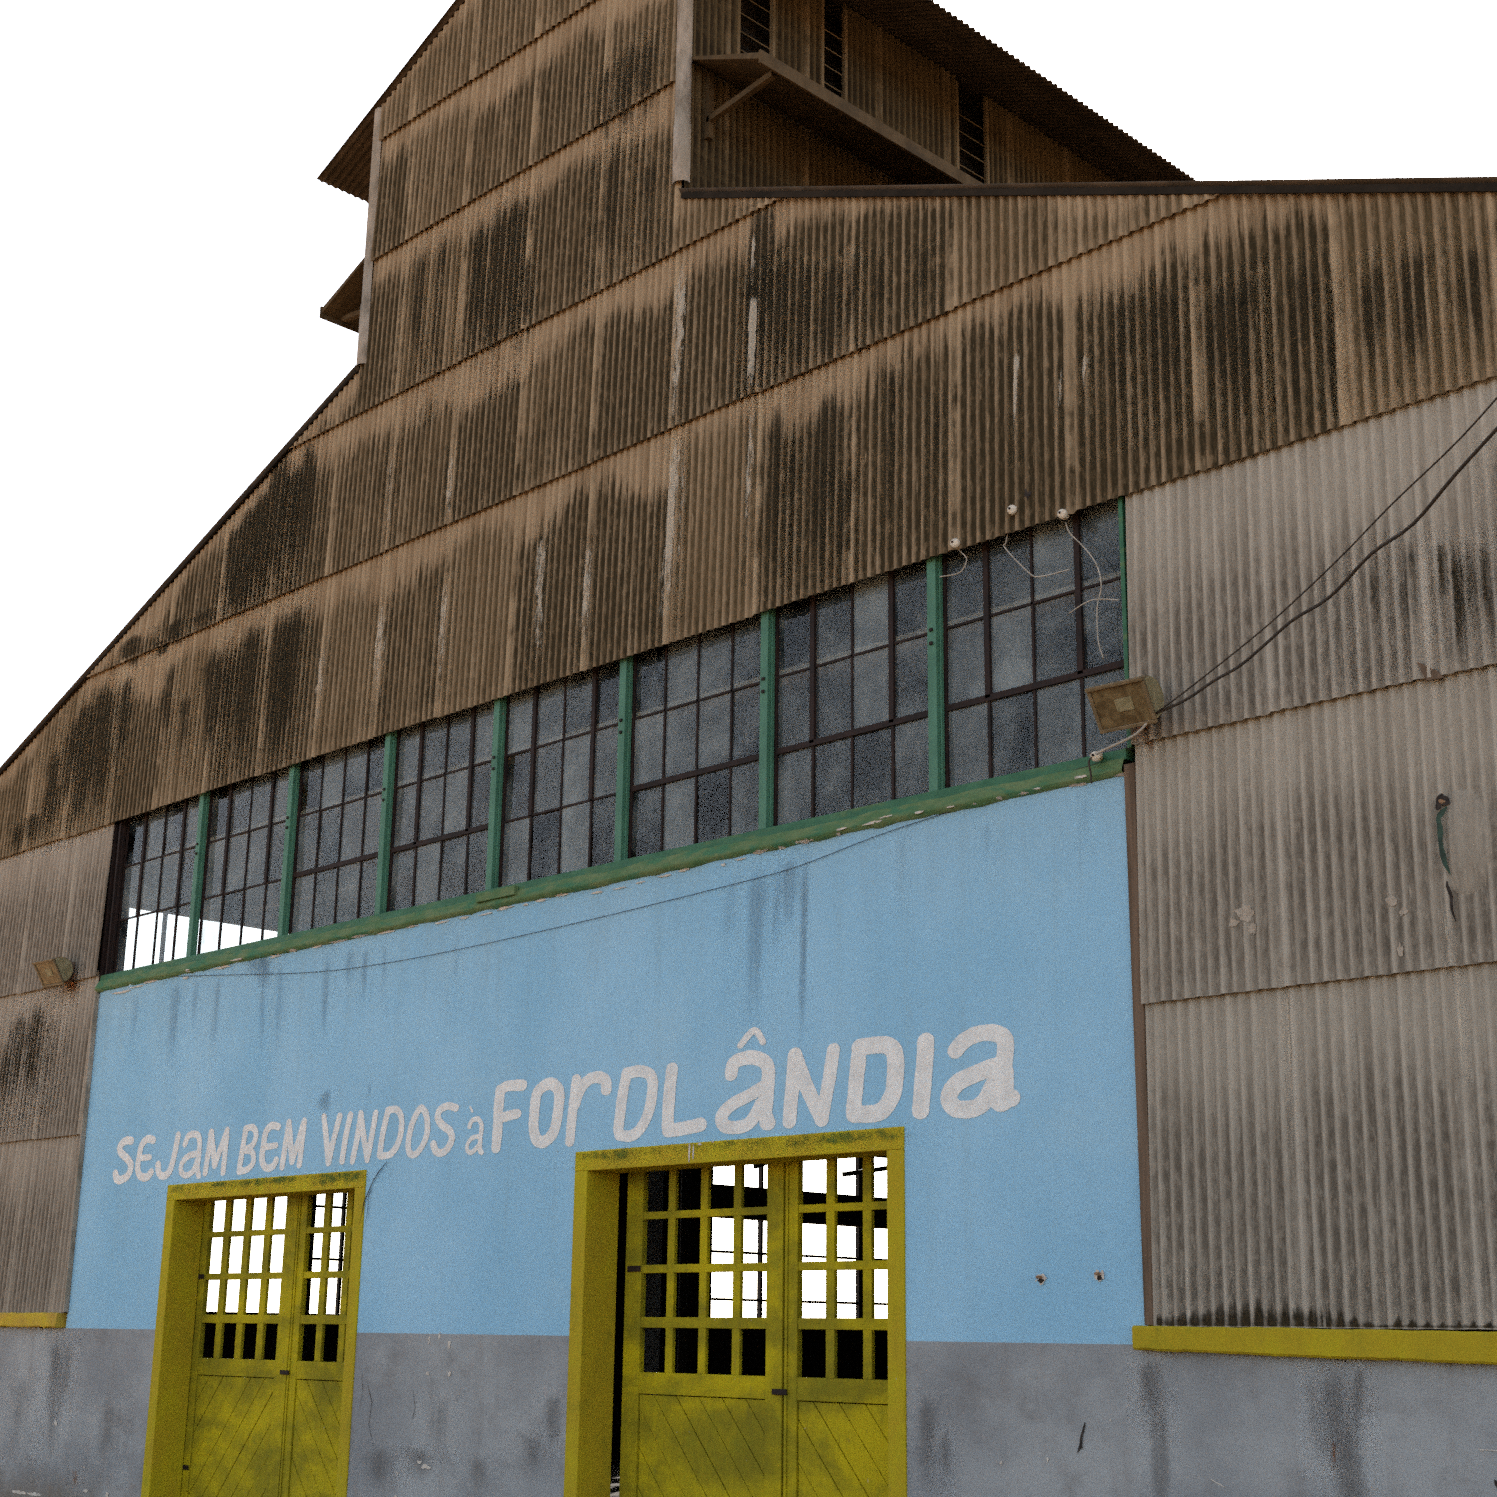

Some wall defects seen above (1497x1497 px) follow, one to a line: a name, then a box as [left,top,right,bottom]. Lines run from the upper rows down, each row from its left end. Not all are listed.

leakage [469,205,530,353]
efflorescence [672,270,686,401]
leakage [746,208,858,376]
leakage [1206,281,1254,410]
leakage [1362,250,1429,364]
leakage [1458,252,1481,332]
leakage [226,447,317,607]
efflorescence [663,444,684,597]
leakage [769,396,851,558]
leakage [1438,546,1494,643]
leakage [13,610,301,843]
peeling [1229,904,1256,935]